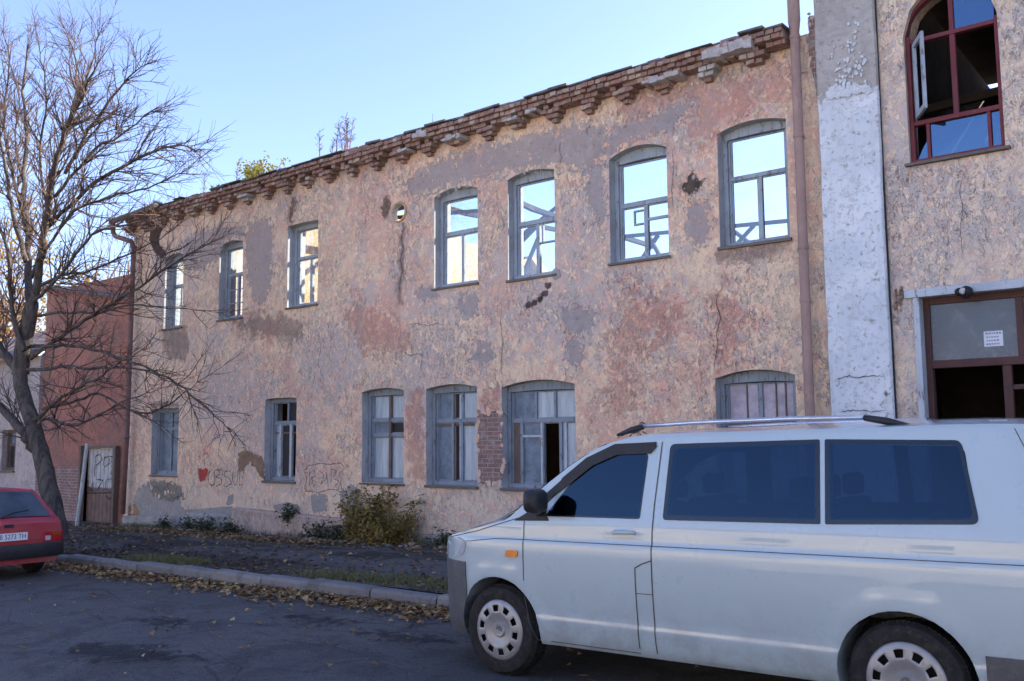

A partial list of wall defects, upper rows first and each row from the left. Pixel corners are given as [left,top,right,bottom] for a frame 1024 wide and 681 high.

peeling [807,12,872,107]
peeling [402,79,701,231]
peeling [679,170,718,249]
spalling [525,268,561,308]
crack [714,294,725,364]
spalling [130,480,234,517]
spalling [237,448,266,480]
spalling [475,408,507,490]